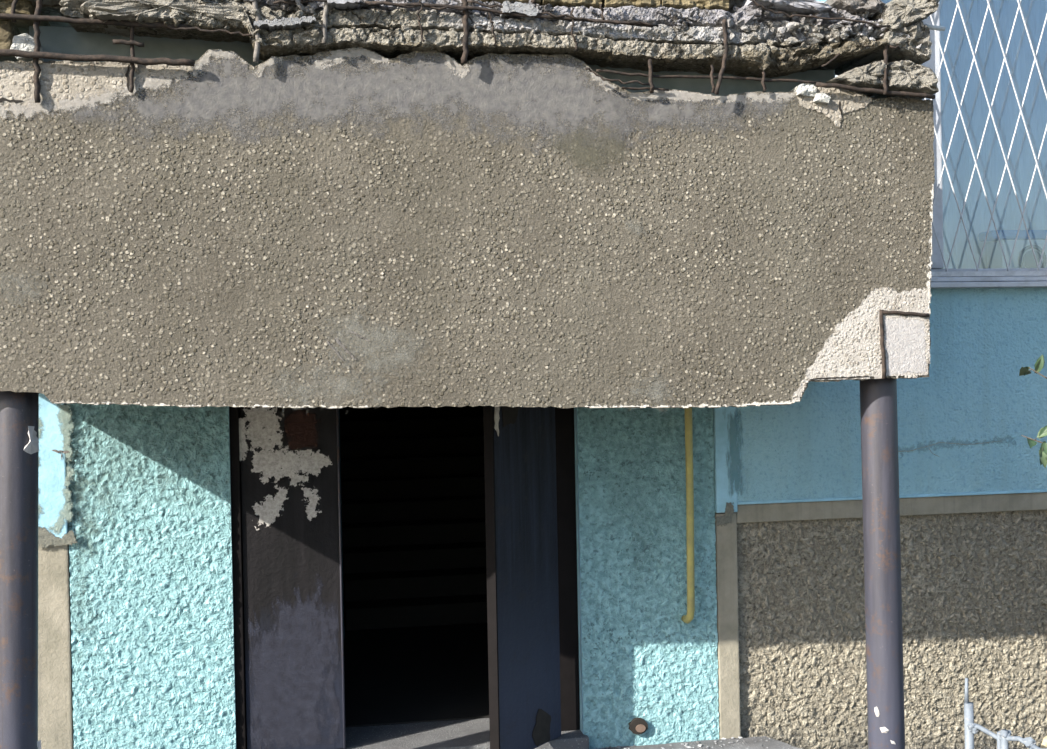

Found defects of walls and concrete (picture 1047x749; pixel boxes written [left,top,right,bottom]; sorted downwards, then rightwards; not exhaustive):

peeling [0,0,935,146]
spalling [585,184,934,408]
peeling [24,419,43,454]
peeling [38,400,210,548]
peeling [224,404,368,530]